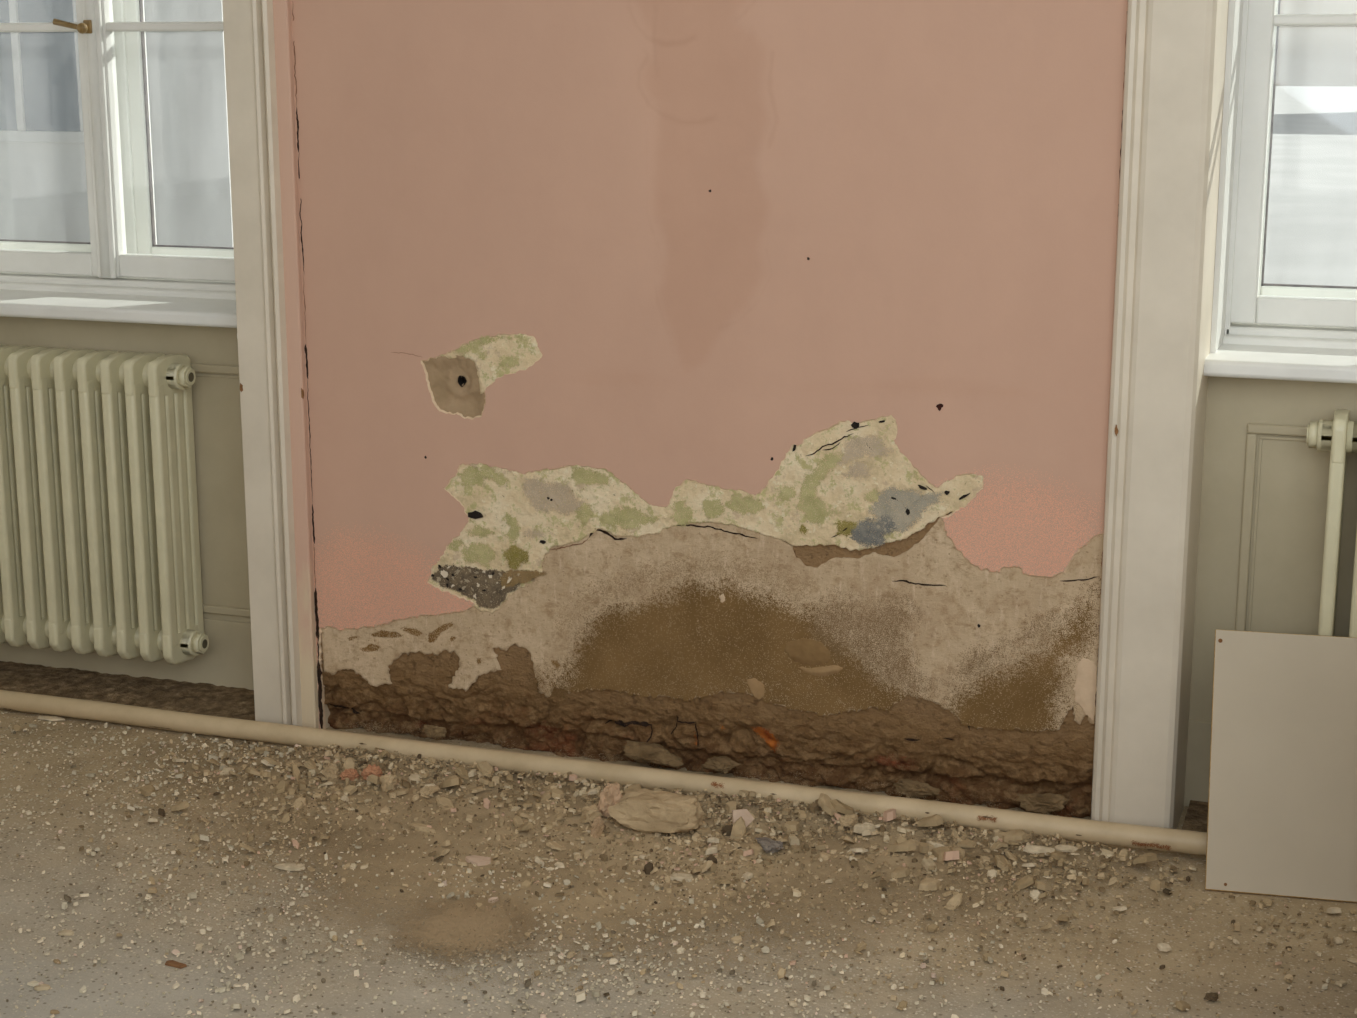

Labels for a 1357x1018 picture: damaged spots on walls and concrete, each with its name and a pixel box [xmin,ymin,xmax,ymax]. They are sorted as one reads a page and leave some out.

peeling [423,334,542,418]
spalling [321,416,1104,818]
damp [526,545,1101,733]